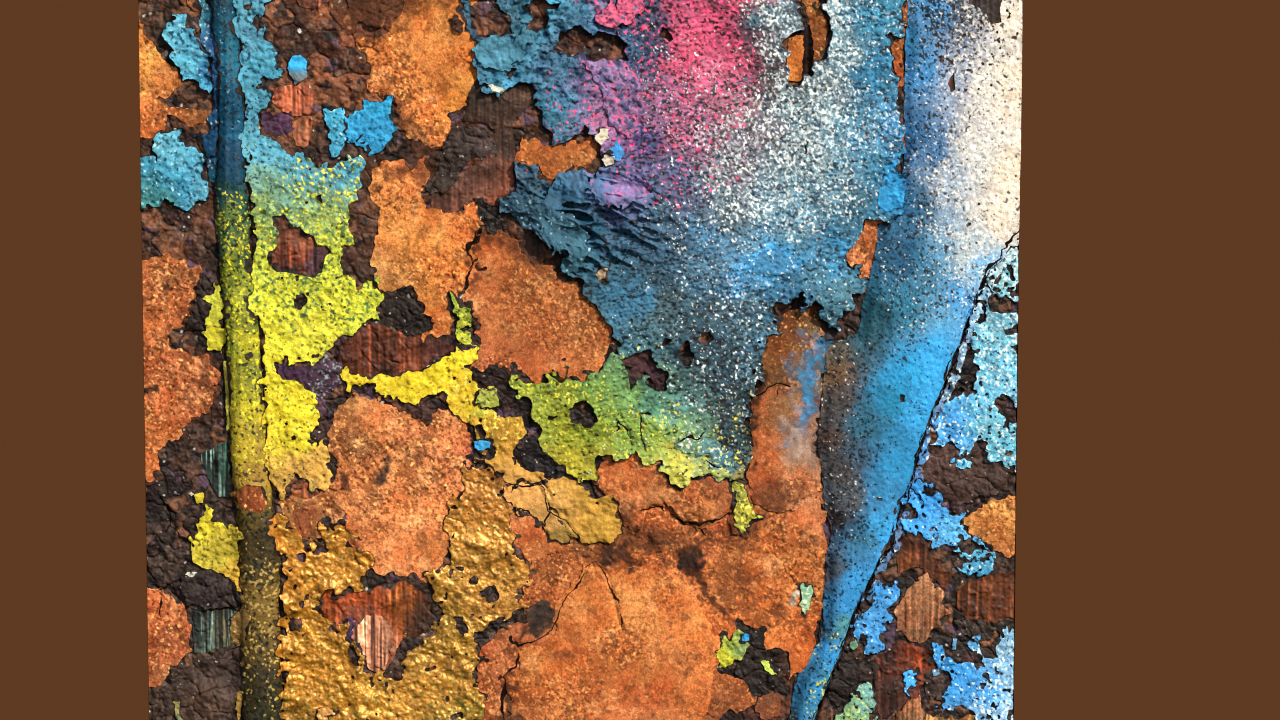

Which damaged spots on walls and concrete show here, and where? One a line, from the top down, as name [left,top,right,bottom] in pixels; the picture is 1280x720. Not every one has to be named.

corrosion [142,252,224,482]
corrosion [330,0,614,477]
peeling [140,0,1022,720]
corrosion [472,302,828,720]